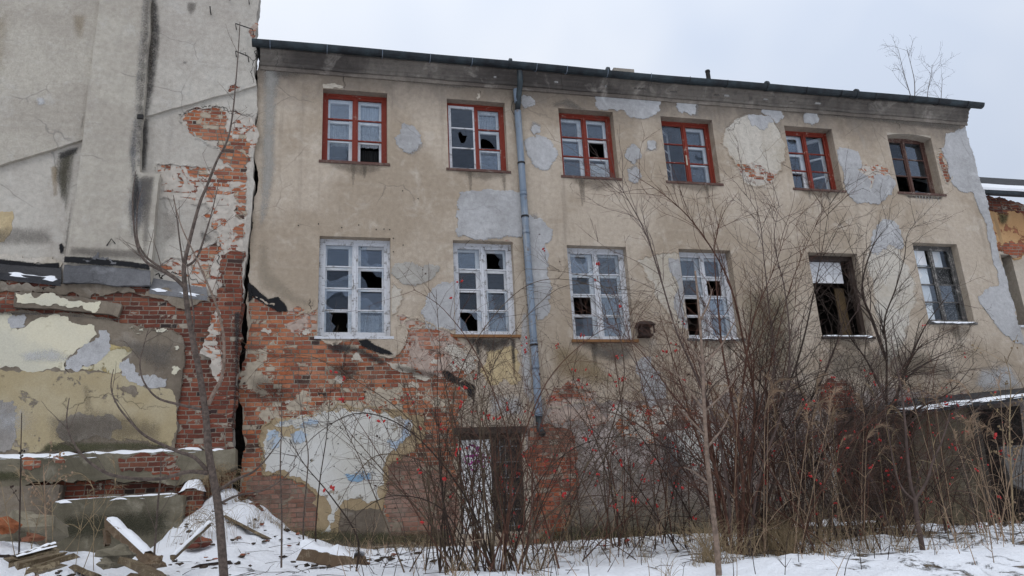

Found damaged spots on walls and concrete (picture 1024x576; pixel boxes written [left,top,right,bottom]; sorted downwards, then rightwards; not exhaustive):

leakage [129,1,158,241]
flaking render [0,309,186,480]
flaking render [154,104,1024,548]